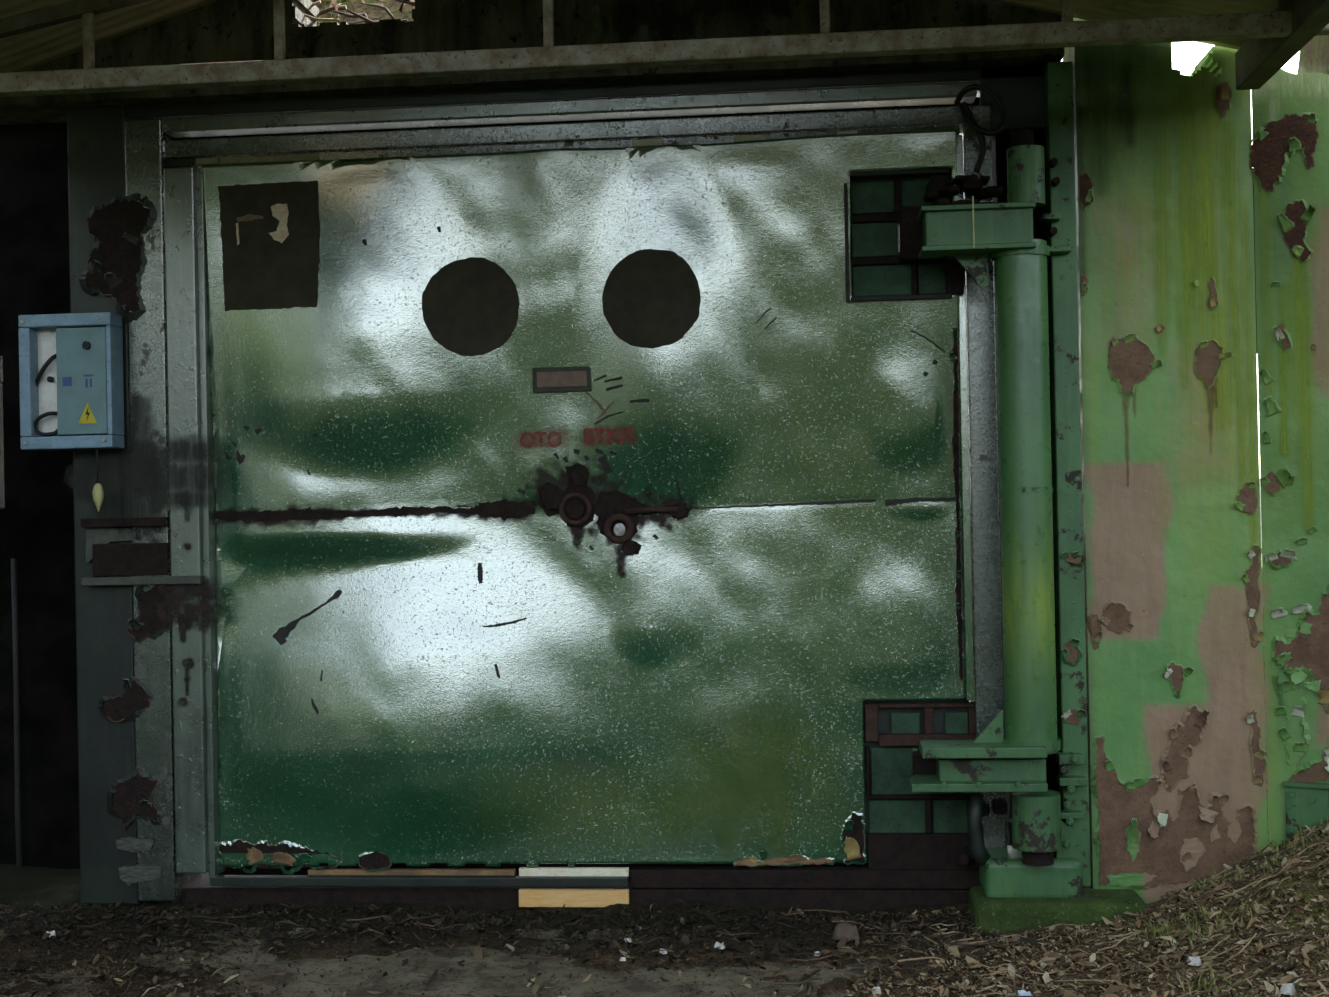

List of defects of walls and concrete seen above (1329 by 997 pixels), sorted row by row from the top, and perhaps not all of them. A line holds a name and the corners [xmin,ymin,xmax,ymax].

peeling [1248,112,1319,192]
peeling [78,194,157,322]
peeling [1276,199,1316,264]
peeling [1108,324,1165,396]
peeling [1194,338,1233,390]
corrosion [568,466,695,578]
corrosion [179,658,194,706]
corrosion [153,580,221,643]
peeling [1060,601,1134,667]
peeling [1242,526,1329,787]
peeling [1090,661,1258,890]
peeling [107,768,166,886]